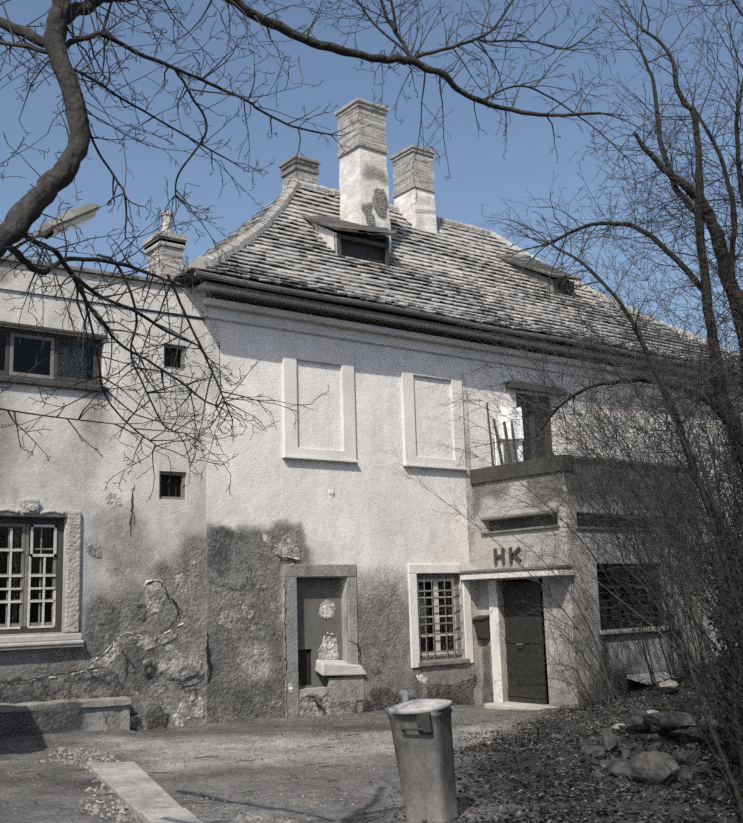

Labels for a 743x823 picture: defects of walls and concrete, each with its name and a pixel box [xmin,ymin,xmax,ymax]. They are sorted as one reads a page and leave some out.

spalling [362,188,388,226]
crack [128,485,136,535]
flaking render [262,533,301,560]
leakage [0,524,309,730]
crack [164,588,182,631]
flaking render [319,600,335,619]
flaking render [317,632,339,660]
crack [0,648,135,689]
flaking render [0,623,205,730]
crack [173,633,213,703]
leakage [0,697,82,737]